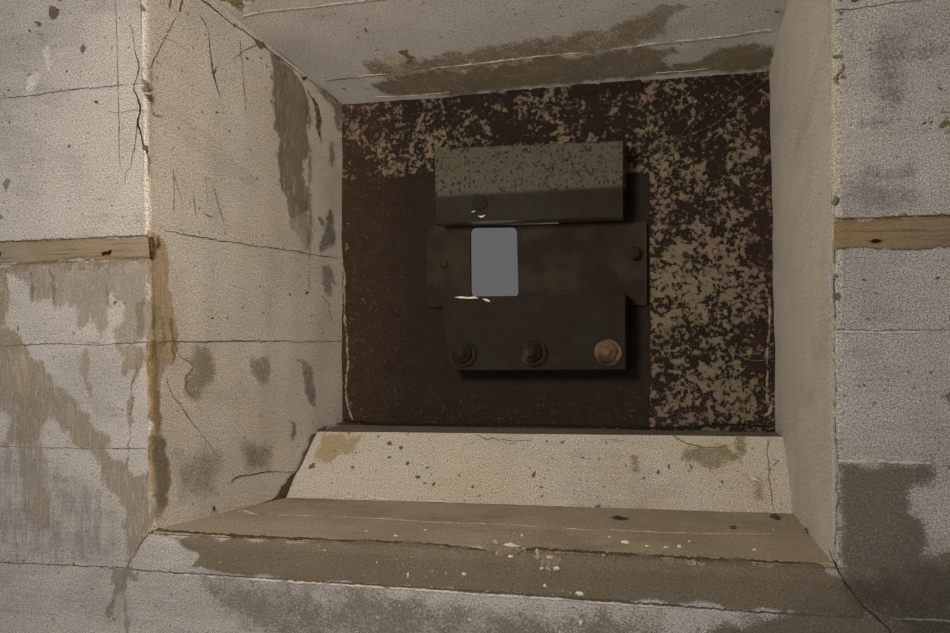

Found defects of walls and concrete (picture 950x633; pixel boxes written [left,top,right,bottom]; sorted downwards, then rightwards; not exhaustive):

crack [3,1,178,182]
spalling [220,0,254,12]
crack [199,0,341,113]
damp [270,53,312,247]
damp [318,89,342,130]
corrosion [489,87,545,97]
damp [365,4,774,96]
corrosion [570,79,643,98]
damp [0,258,152,627]
crack [0,529,486,569]
damp [179,463,950,633]
crack [526,547,892,633]